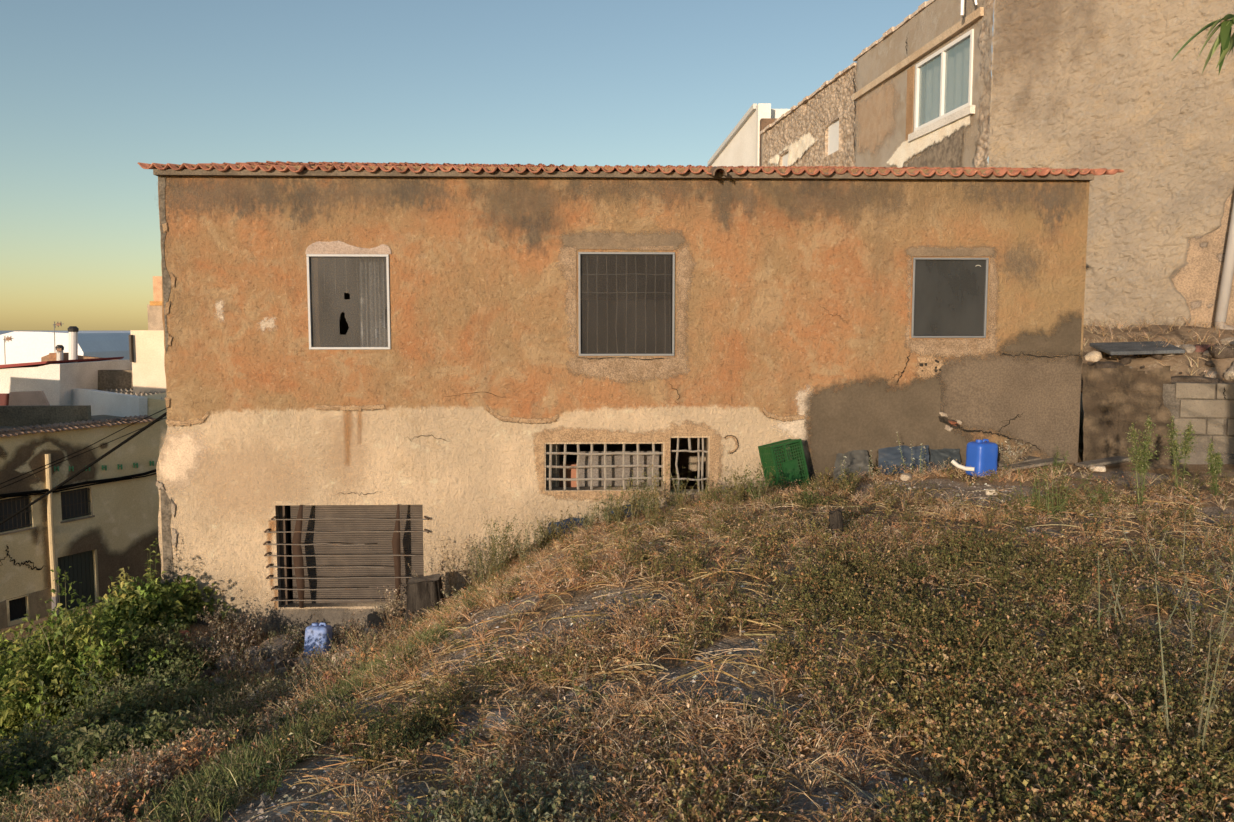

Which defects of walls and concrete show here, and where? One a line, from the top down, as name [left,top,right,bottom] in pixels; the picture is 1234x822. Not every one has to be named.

spalling [1171,192,1234,328]
crack [939,412,1041,452]
crack [0,546,46,570]